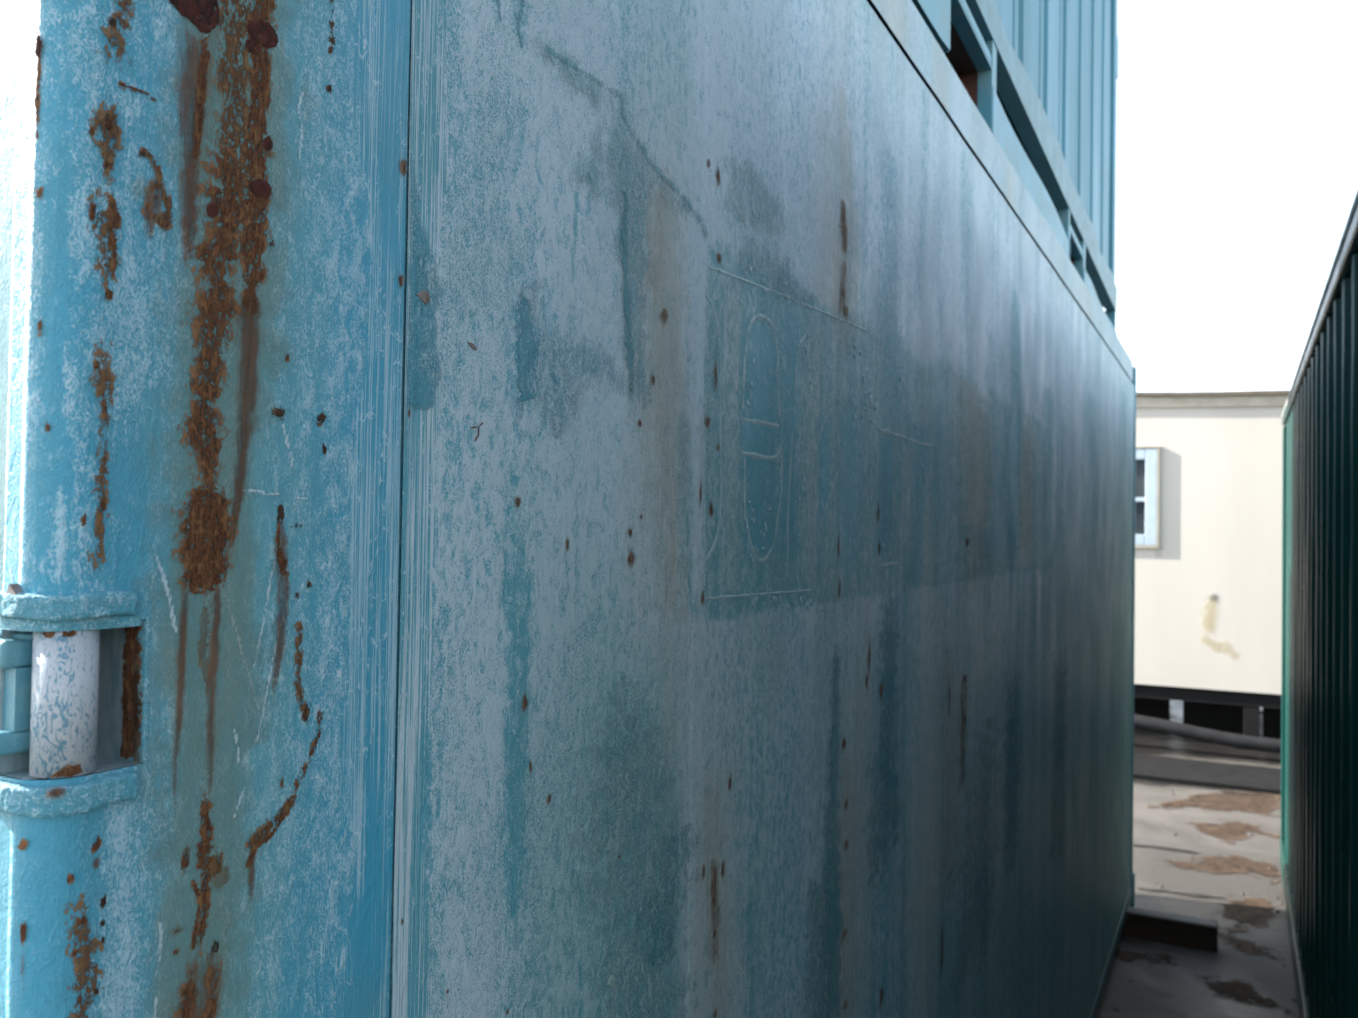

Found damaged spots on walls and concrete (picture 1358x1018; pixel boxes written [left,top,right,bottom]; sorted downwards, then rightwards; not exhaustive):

rust [81,0,279,771]
rust [245,505,324,896]
rust [64,873,107,1018]
rust [91,835,102,868]
rust [170,790,231,1018]